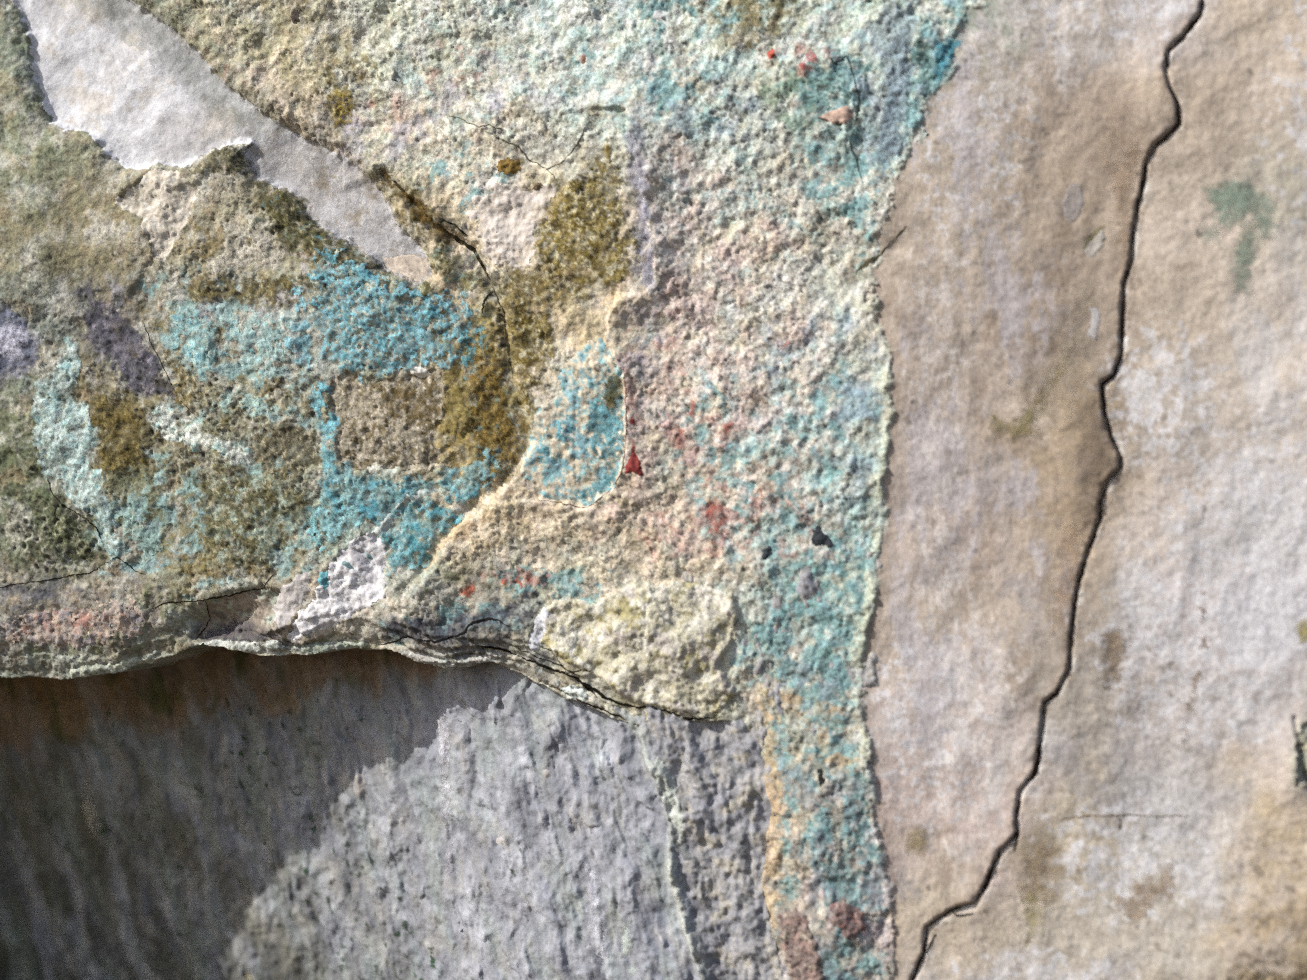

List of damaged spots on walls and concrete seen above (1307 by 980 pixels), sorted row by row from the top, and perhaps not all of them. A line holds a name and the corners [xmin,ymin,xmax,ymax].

spalling [11,0,499,654]
crack [391,179,513,378]
crack [856,227,905,272]
crack [911,0,1203,980]
spalling [1,598,160,679]
spalling [396,579,741,718]
peeling [647,756,703,962]